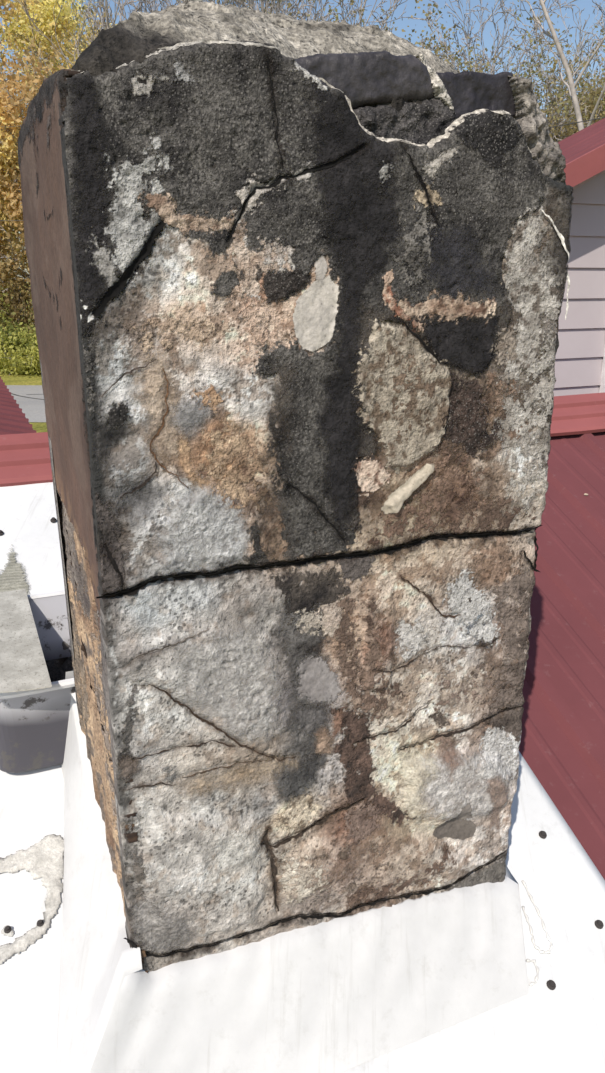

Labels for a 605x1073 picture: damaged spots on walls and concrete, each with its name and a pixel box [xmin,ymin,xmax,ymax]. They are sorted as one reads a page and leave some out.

crack [227,52,365,240]
crack [397,140,440,226]
crack [93,221,166,317]
peeling [62,39,570,565]
crack [66,484,543,618]
crack [372,638,499,673]
crack [353,701,526,750]
crack [123,798,509,958]